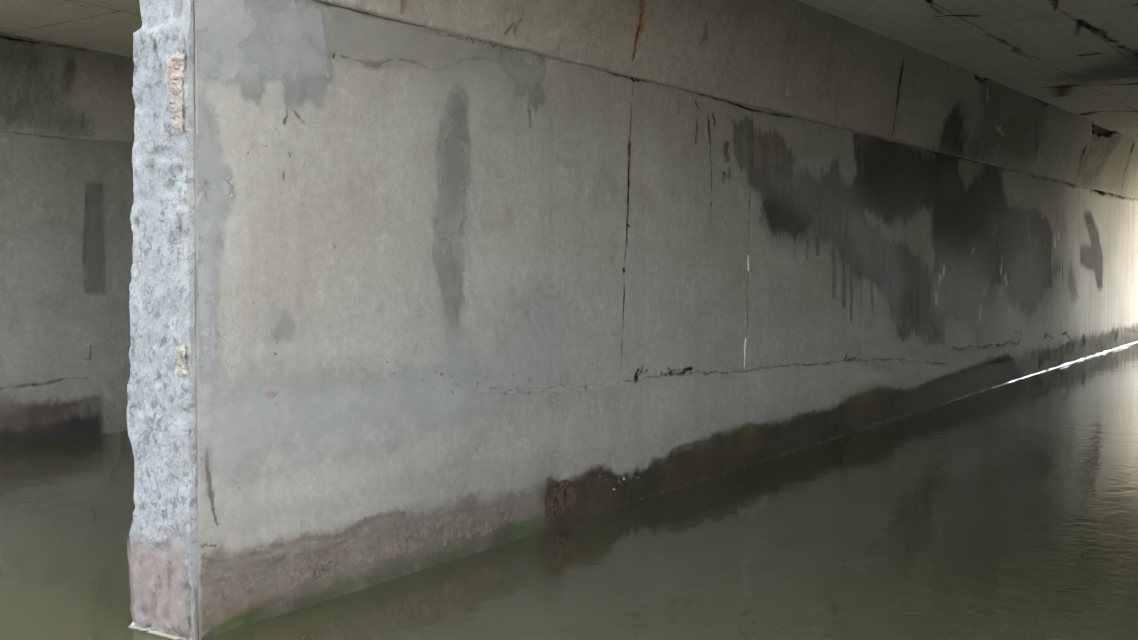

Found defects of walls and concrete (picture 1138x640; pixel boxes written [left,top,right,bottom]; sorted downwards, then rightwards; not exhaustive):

damp [196,0,331,105]
damp [434,85,470,325]
corrosion [633,0,644,61]
crack [597,69,747,383]
crack [685,90,792,213]
damp [733,105,1052,346]
crack [882,0,1138,200]
damp [1080,212,1103,288]
crack [18,378,64,387]
crack [797,330,1069,366]